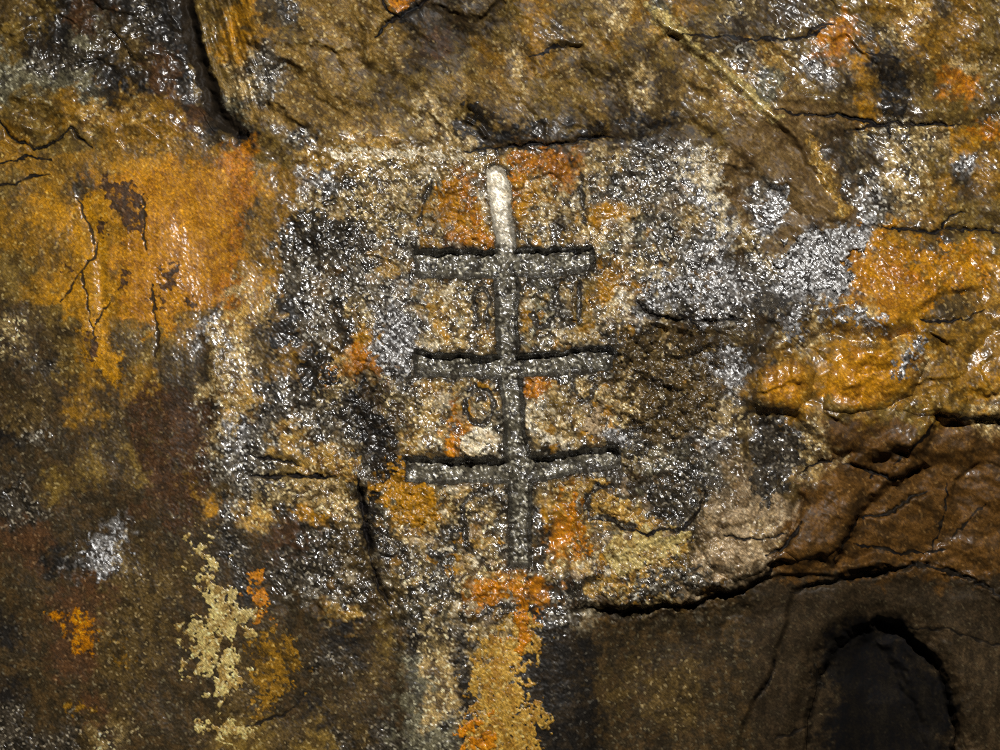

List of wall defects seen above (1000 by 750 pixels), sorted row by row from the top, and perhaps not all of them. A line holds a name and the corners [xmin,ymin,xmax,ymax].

crack [0,120,93,186]
crack [776,108,962,140]
crack [60,196,111,336]
crack [139,194,147,250]
crack [151,283,161,358]
crack [238,453,393,607]
crack [581,521,802,614]
crack [792,413,1000,597]